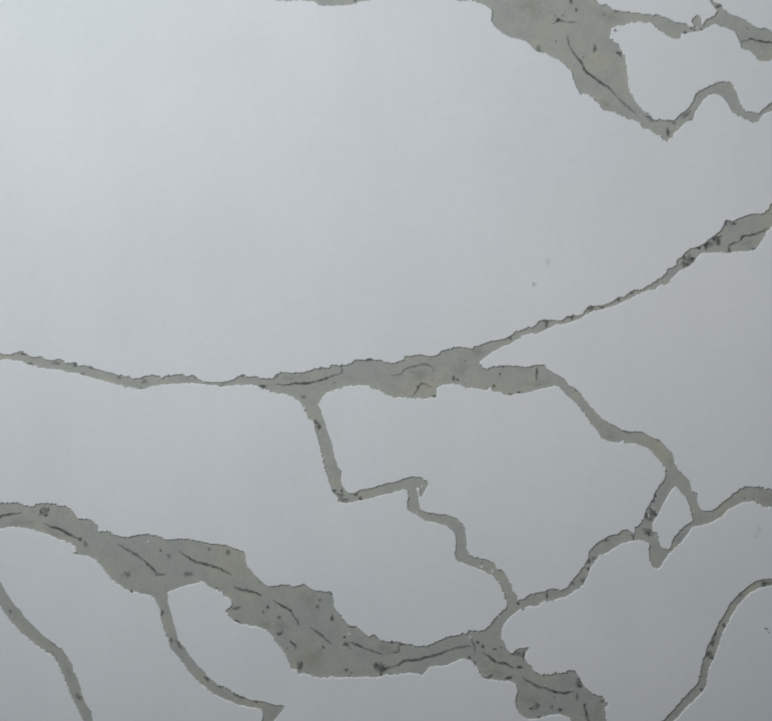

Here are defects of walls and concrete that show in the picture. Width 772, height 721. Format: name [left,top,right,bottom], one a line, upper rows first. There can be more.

spalling [460,0,725,141]
spalling [261,346,565,406]
spalling [0,503,608,721]